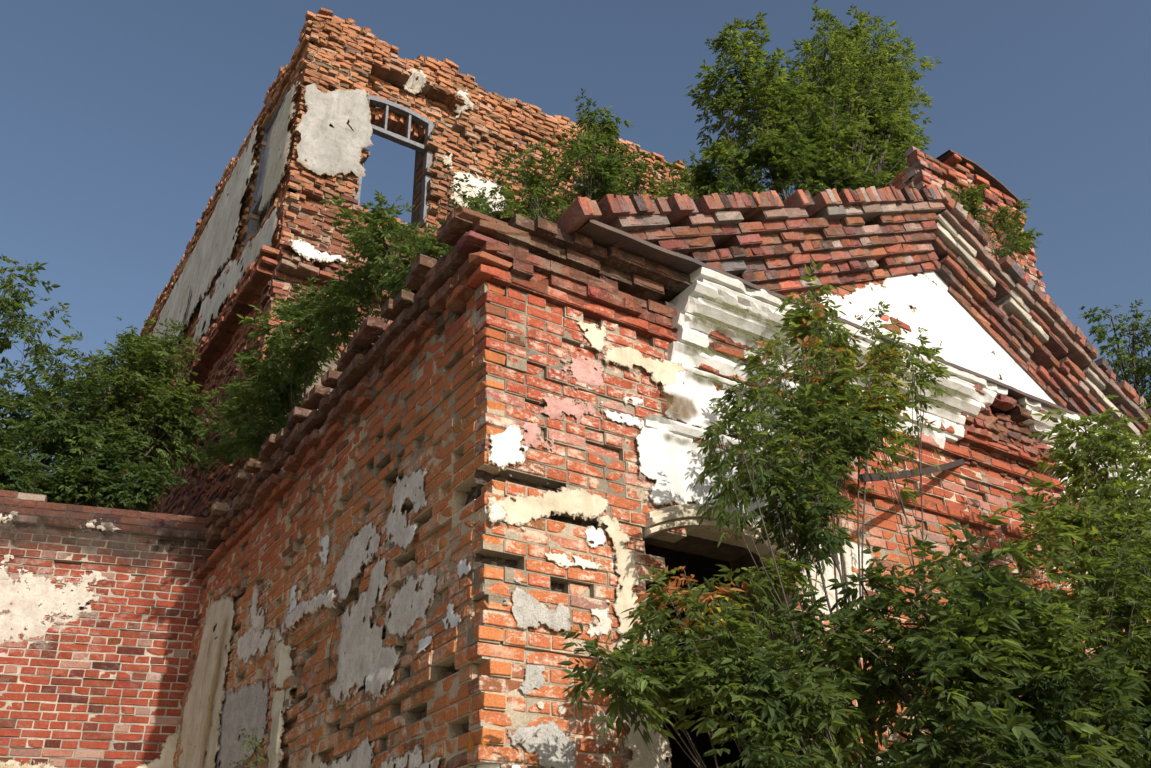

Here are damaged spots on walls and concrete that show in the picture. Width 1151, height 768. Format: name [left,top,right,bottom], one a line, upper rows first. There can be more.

flaking render [148,81,374,345]
flaking render [442,151,506,213]
flaking render [805,271,1067,493]
flaking render [80,518,121,532]
flaking render [464,321,873,650]
flaking render [0,554,108,657]
flaking render [137,468,578,768]
flaking render [0,759,57,768]
flaking render [614,697,672,768]